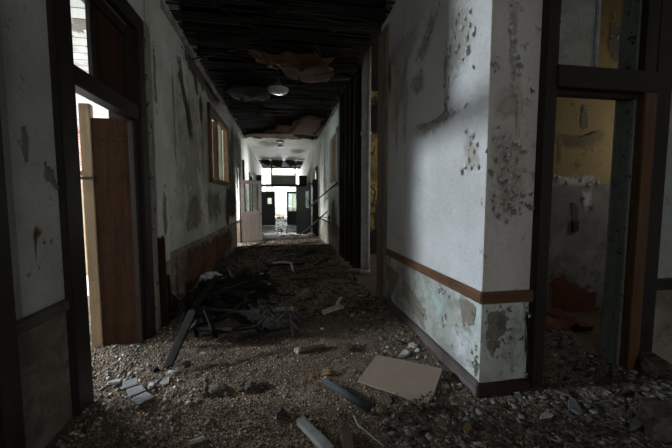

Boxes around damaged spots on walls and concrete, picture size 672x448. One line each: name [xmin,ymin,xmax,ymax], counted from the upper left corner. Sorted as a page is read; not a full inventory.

peeling [246,49,335,83]
peeling [418,7,475,133]
water stain [172,44,219,202]
water stain [208,124,242,226]
peeling [244,115,326,139]
peeling [460,130,480,175]
peeling [485,125,534,224]
spalling [547,265,600,312]
spalling [451,298,531,377]